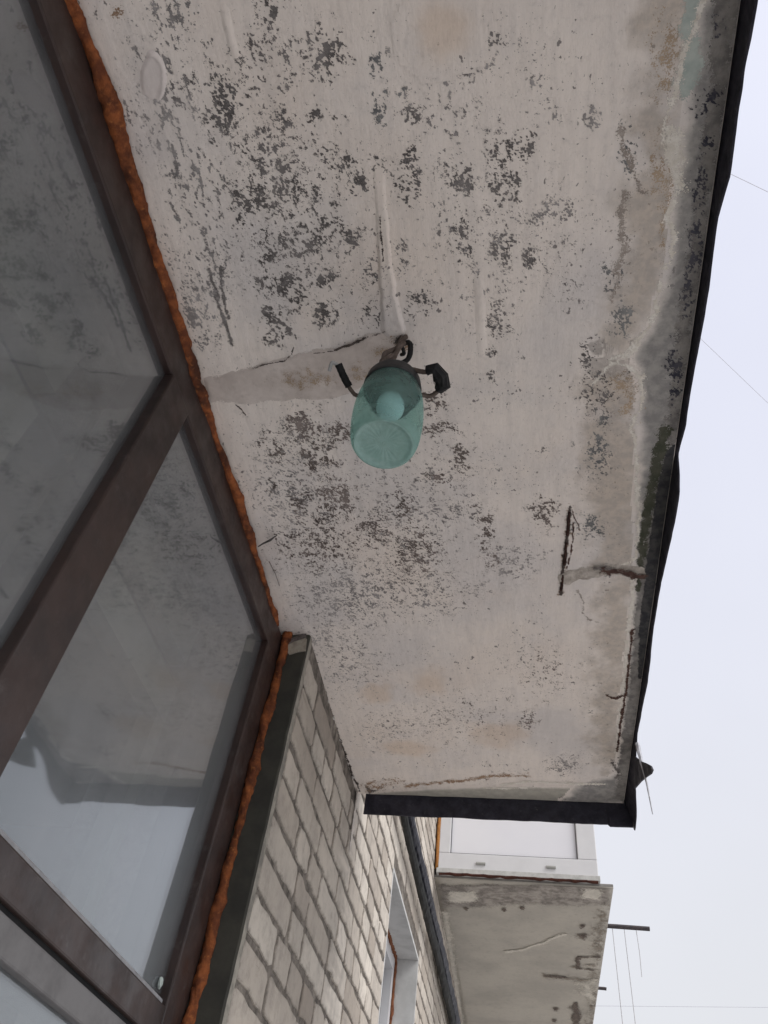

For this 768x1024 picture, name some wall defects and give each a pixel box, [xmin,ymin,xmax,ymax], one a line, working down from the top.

crack [254,332,383,368]
damp [344,0,740,803]
corrosion [605,629,635,752]